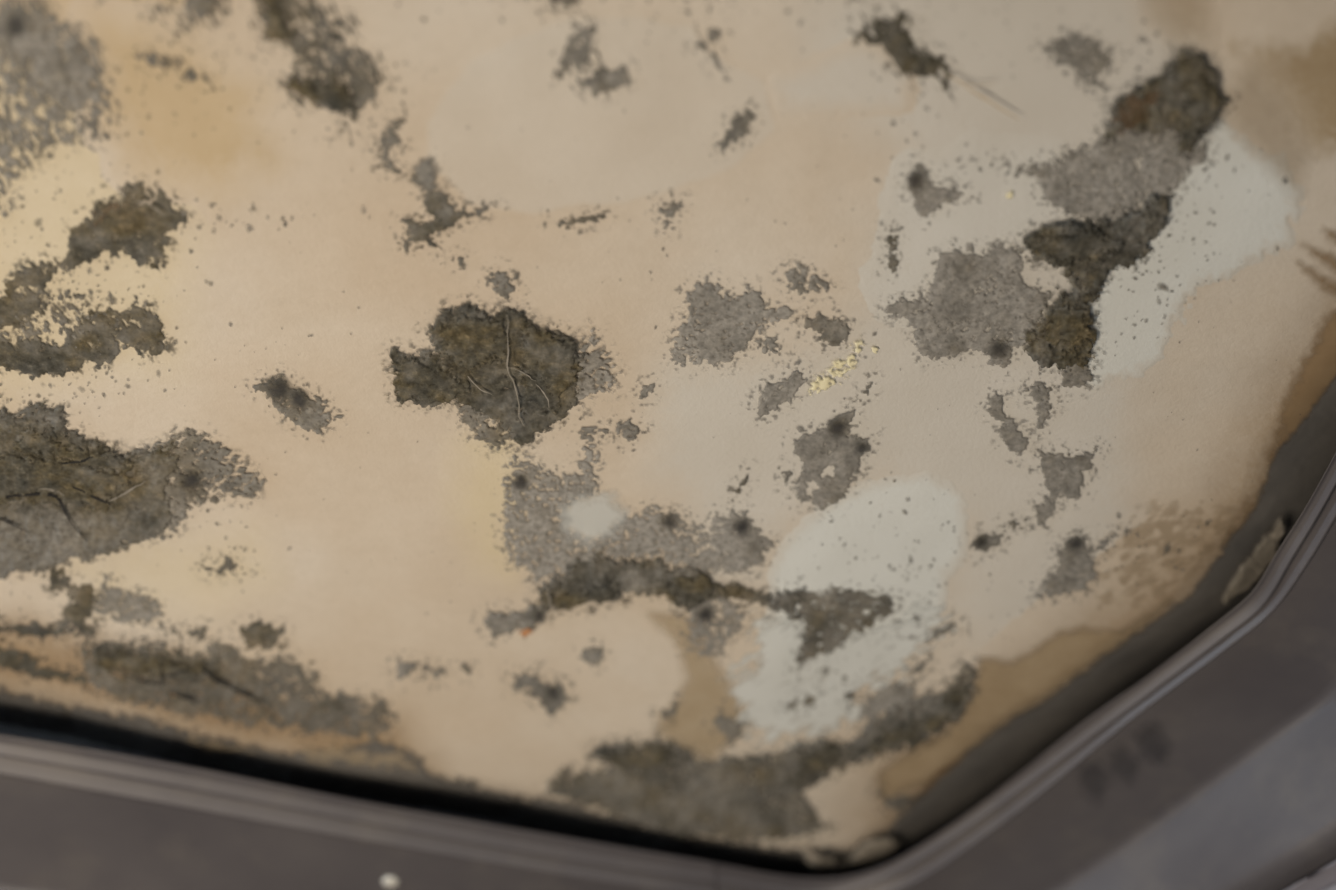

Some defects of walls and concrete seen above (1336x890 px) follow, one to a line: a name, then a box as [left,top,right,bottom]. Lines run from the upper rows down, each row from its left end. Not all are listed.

damp [362,54,435,174]
damp [1031,28,1158,93]
damp [0,0,352,422]
damp [901,125,1228,306]
damp [655,263,855,421]
damp [0,428,477,783]
damp [778,221,1336,853]